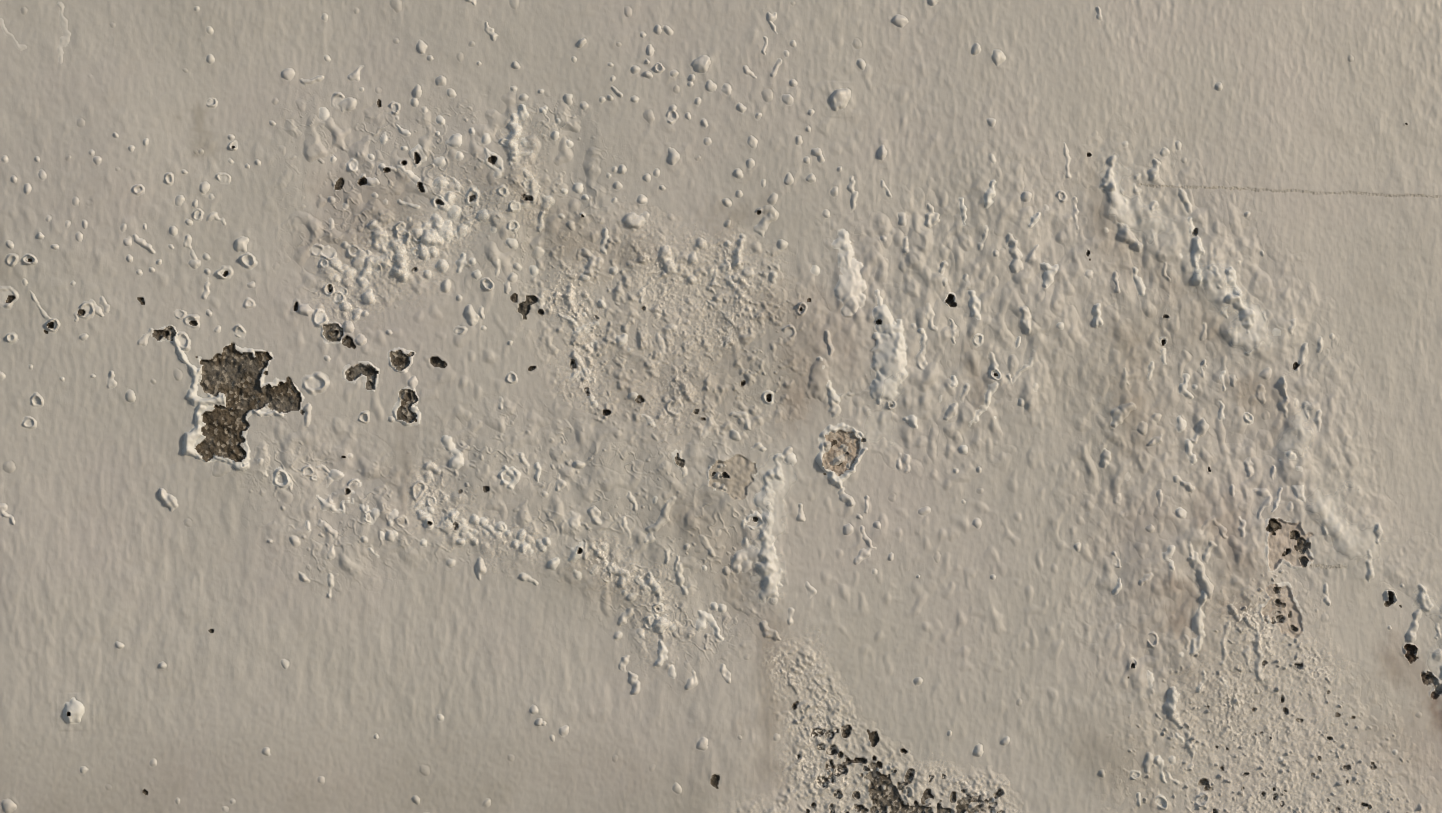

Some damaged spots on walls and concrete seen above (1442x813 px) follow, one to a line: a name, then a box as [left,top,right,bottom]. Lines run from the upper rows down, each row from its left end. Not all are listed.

spalling [151,325,305,472]
spalling [342,347,421,426]
spalling [512,196,868,500]
peeling [1043,111,1442,813]
spalling [729,635,1024,813]